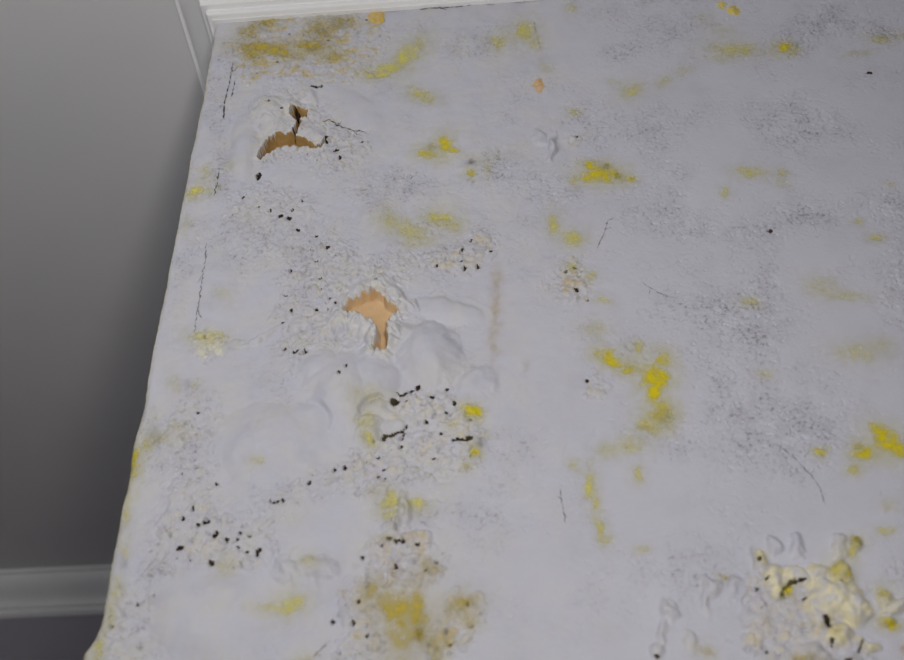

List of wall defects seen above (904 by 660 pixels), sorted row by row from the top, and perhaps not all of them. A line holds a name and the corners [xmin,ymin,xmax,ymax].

mould [241,30,288,59]
peeling [223,12,392,88]
mould [367,44,419,78]
peeling [252,101,333,180]
peeling [419,224,502,277]
peeling [329,276,412,363]
mould [596,350,670,431]
mould [851,423,904,472]
mould [367,585,427,648]
water stain [883,617,899,630]